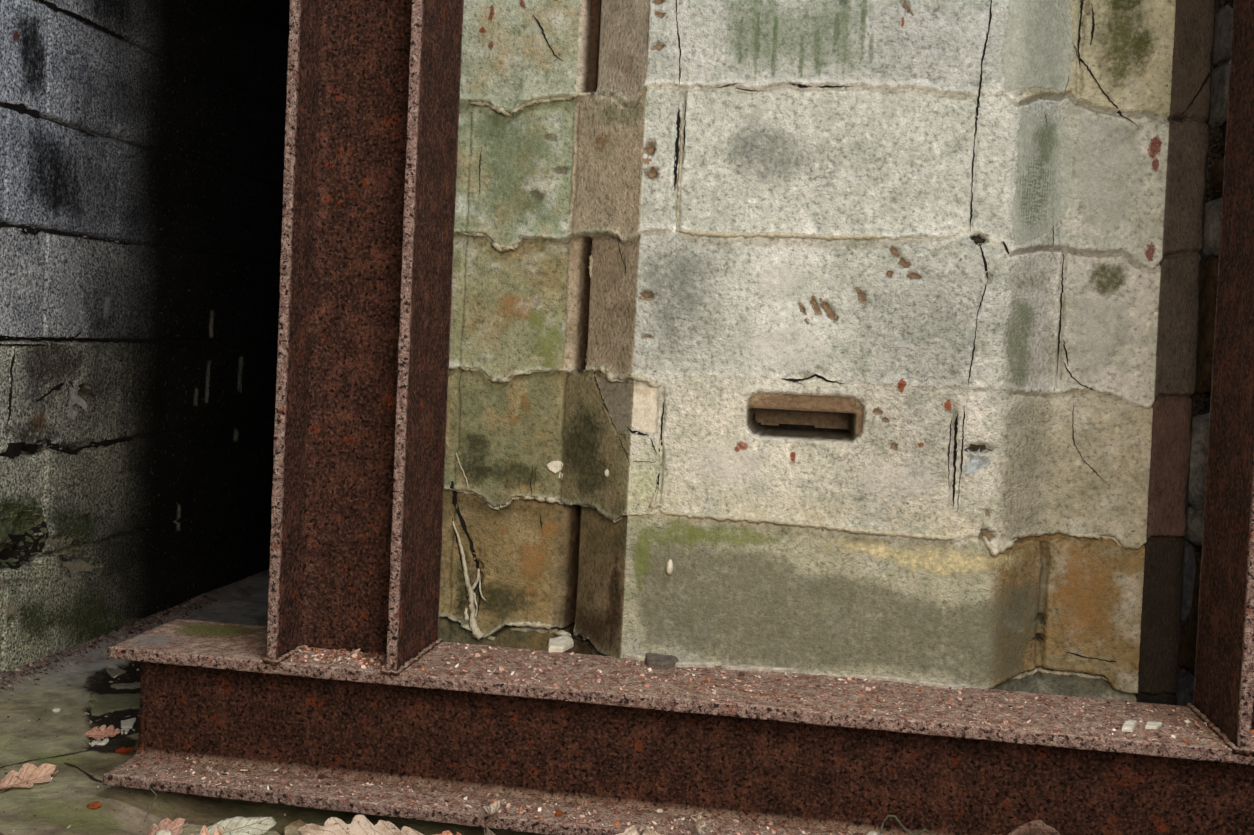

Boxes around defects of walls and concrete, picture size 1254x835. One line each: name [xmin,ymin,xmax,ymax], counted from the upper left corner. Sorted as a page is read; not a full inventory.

leakage [21,18,44,93]
leakage [32,137,78,213]
spalling [643,141,660,181]
crack [0,222,131,245]
crack [948,0,1009,510]
crack [1045,0,1139,481]
spalling [638,290,655,301]
crack [0,327,162,459]
spalling [595,376,658,433]
peeling [547,461,563,480]
leakage [642,543,1043,683]
corrosion [290,645,387,670]